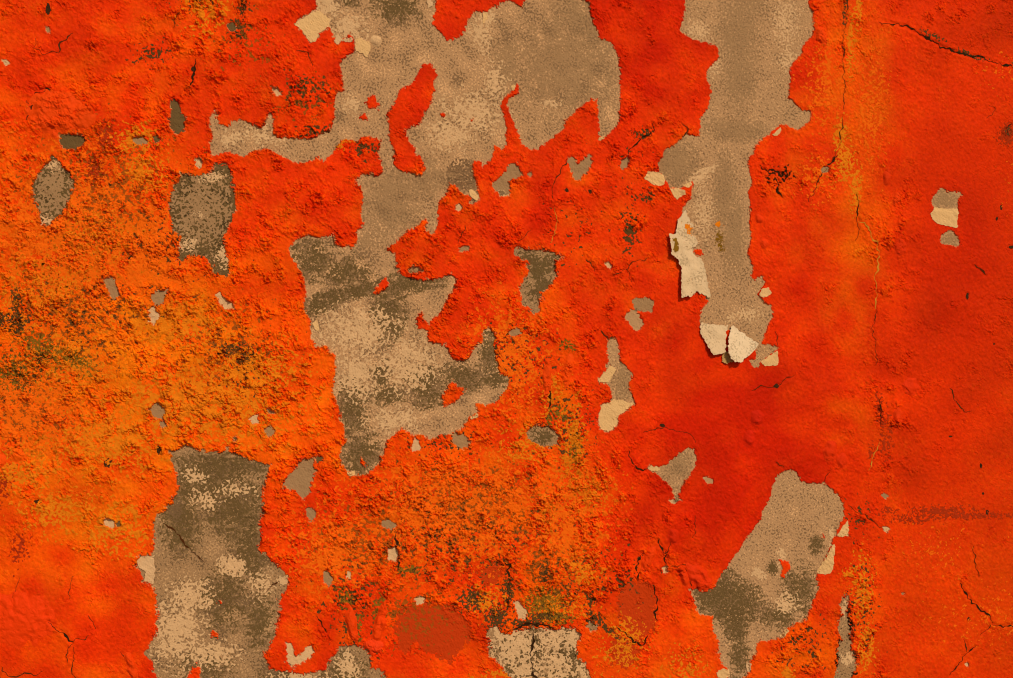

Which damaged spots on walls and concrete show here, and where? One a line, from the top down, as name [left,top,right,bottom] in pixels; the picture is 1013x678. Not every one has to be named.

crack [880,22,1012,67]
peeling [32,156,74,226]
peeling [59,130,85,150]
peeling [168,0,621,476]
peeling [644,0,814,368]
peeling [930,188,962,246]
peeling [598,338,635,432]
peeling [136,437,386,678]
peeling [486,601,598,678]
peeling [688,469,849,678]
crack [950,546,1013,674]